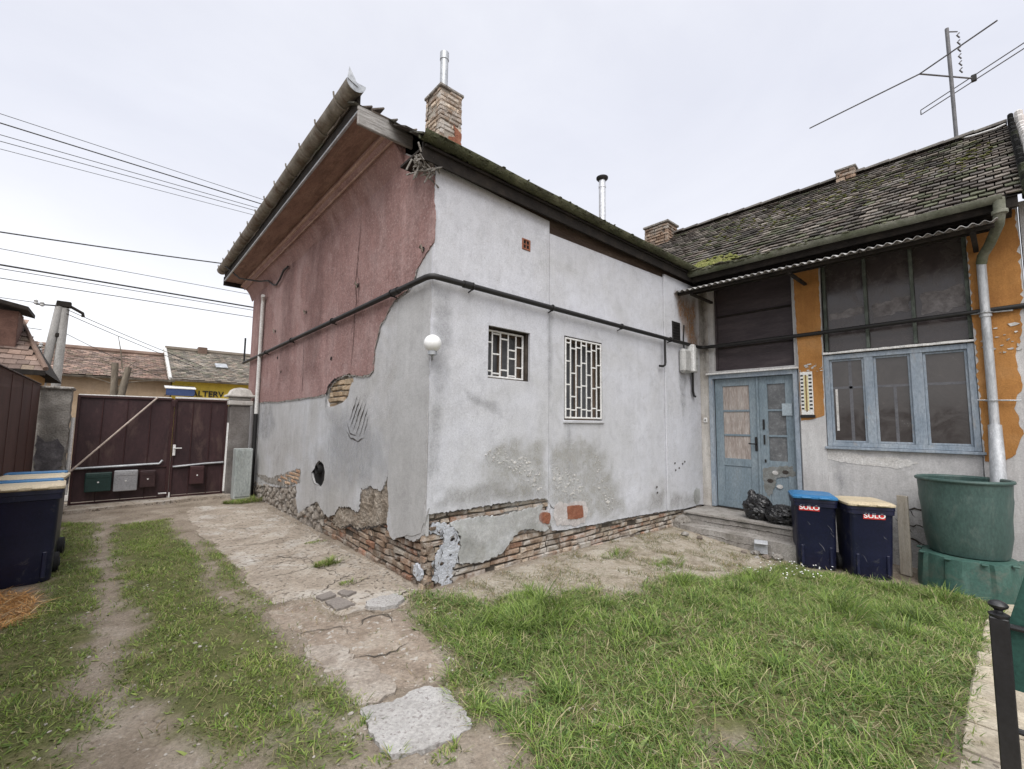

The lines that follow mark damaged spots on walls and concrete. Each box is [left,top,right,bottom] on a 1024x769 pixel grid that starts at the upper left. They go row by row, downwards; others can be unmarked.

spalling [260,269,417,408]
flaking render [317,447,702,590]